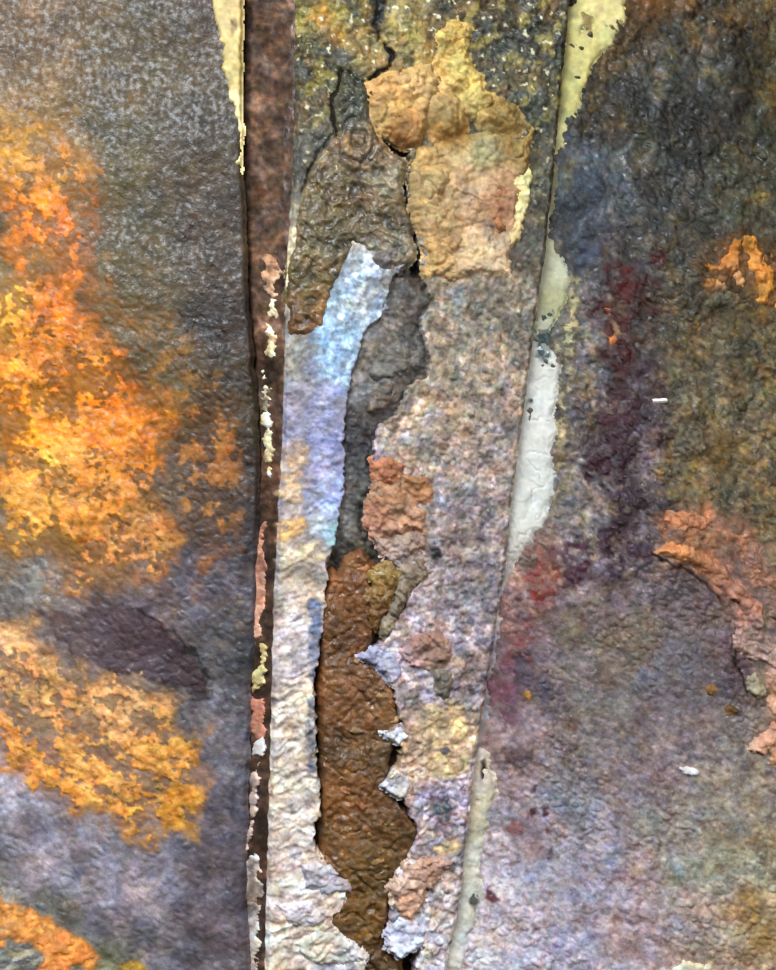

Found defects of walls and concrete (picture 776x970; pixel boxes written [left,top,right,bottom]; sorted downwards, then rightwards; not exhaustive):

peeling [213,0,246,174]
crack [302,26,396,190]
corrosion [0,111,240,593]
peeling [261,370,275,478]
crack [326,235,431,571]
peeling [355,0,627,970]
corrosion [694,234,776,324]
corrosion [0,616,207,845]
peeling [246,521,268,970]
crack [311,819,319,844]
corrosion [0,897,99,970]
crack [401,953,413,970]